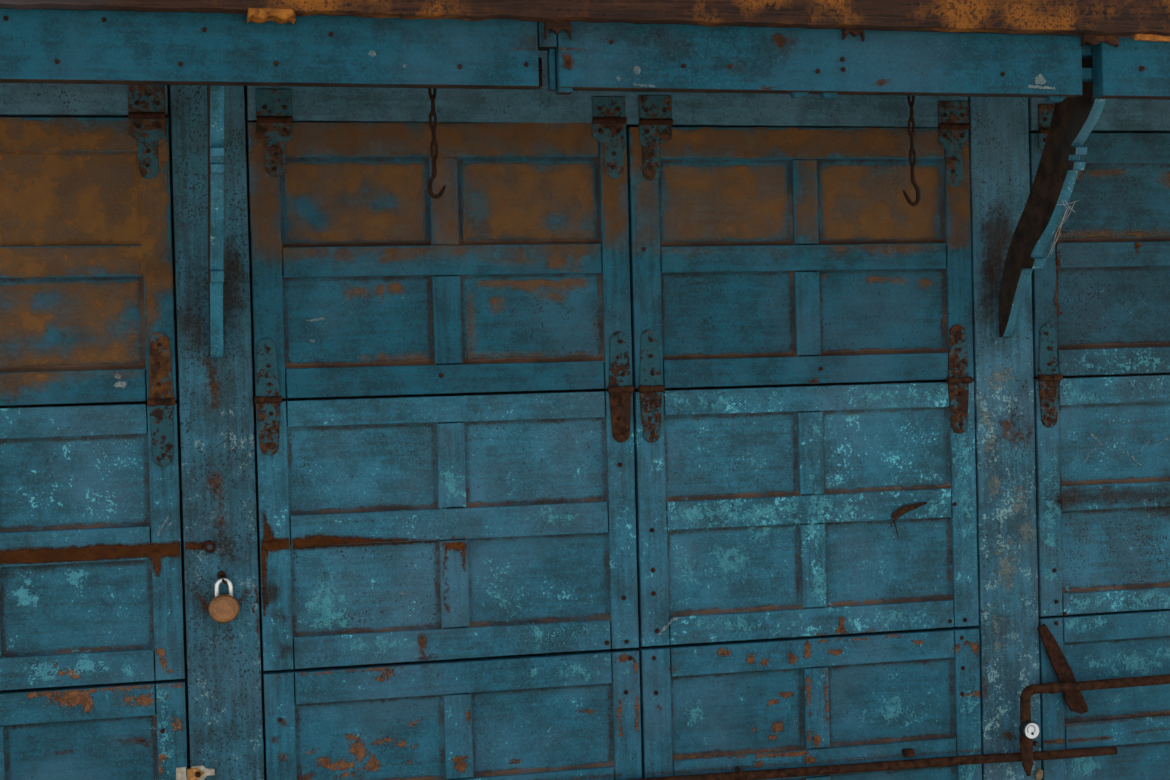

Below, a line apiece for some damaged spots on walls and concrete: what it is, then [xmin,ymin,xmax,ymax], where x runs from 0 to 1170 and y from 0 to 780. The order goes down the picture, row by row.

peeling [663,398,942,666]
rust [0,541,204,577]
peeling [12,564,98,616]
peeling [765,670,829,722]
peeling [300,733,417,780]
peeling [452,756,468,774]
peeling [682,721,823,768]
peeling [958,690,980,780]